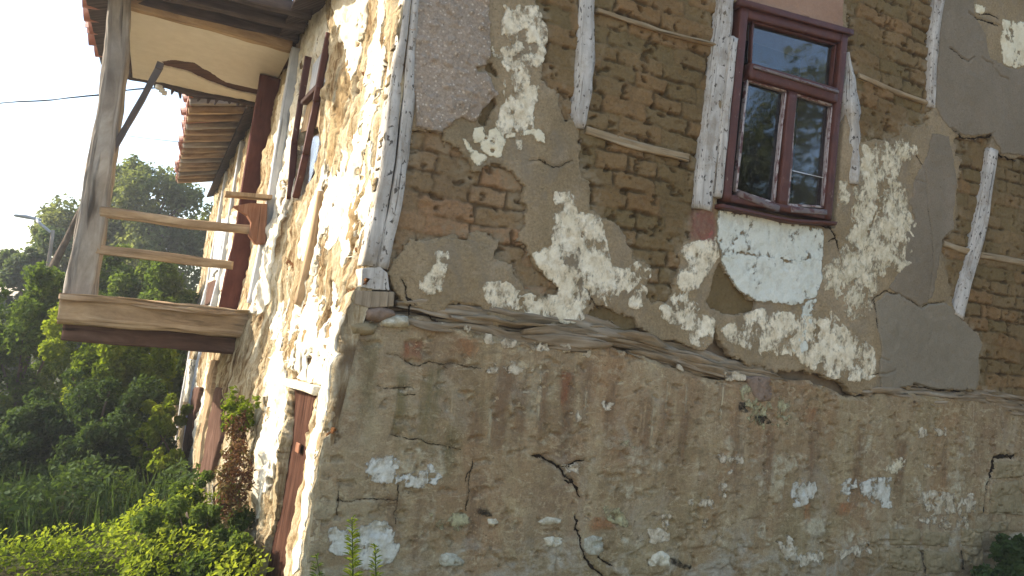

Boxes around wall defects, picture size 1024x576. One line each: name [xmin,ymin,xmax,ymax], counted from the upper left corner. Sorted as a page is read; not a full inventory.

spalling [383,0,932,382]
peeling [248,0,388,575]
spalling [941,136,1024,401]
peeling [327,520,400,571]
peeling [365,455,442,489]
crack [394,435,473,511]
crack [532,454,612,576]
peeling [790,478,817,508]
peeling [840,457,906,509]
crack [983,454,1014,512]